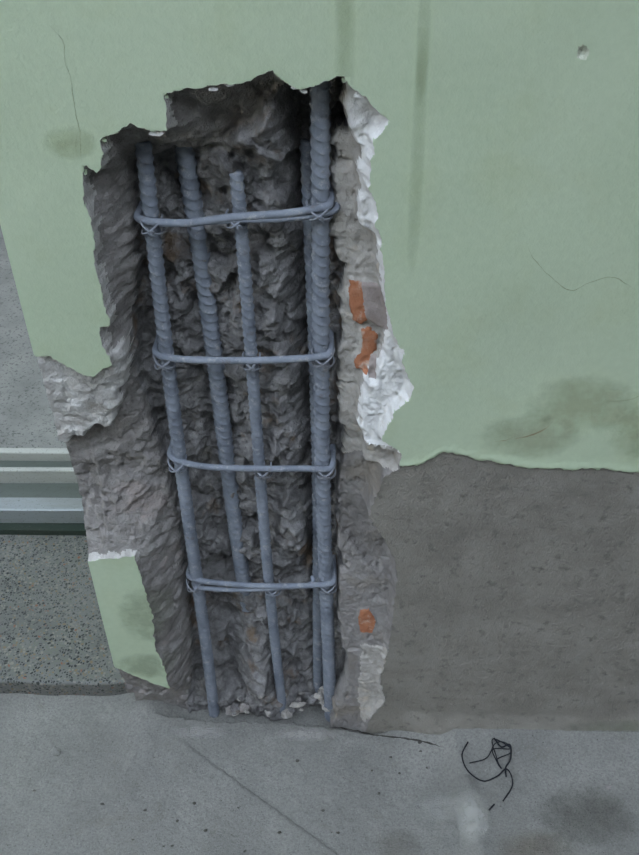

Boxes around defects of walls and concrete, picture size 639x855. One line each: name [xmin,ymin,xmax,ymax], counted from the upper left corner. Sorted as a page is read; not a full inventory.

peeling [577,44,590,60]
spalling [37,70,414,734]